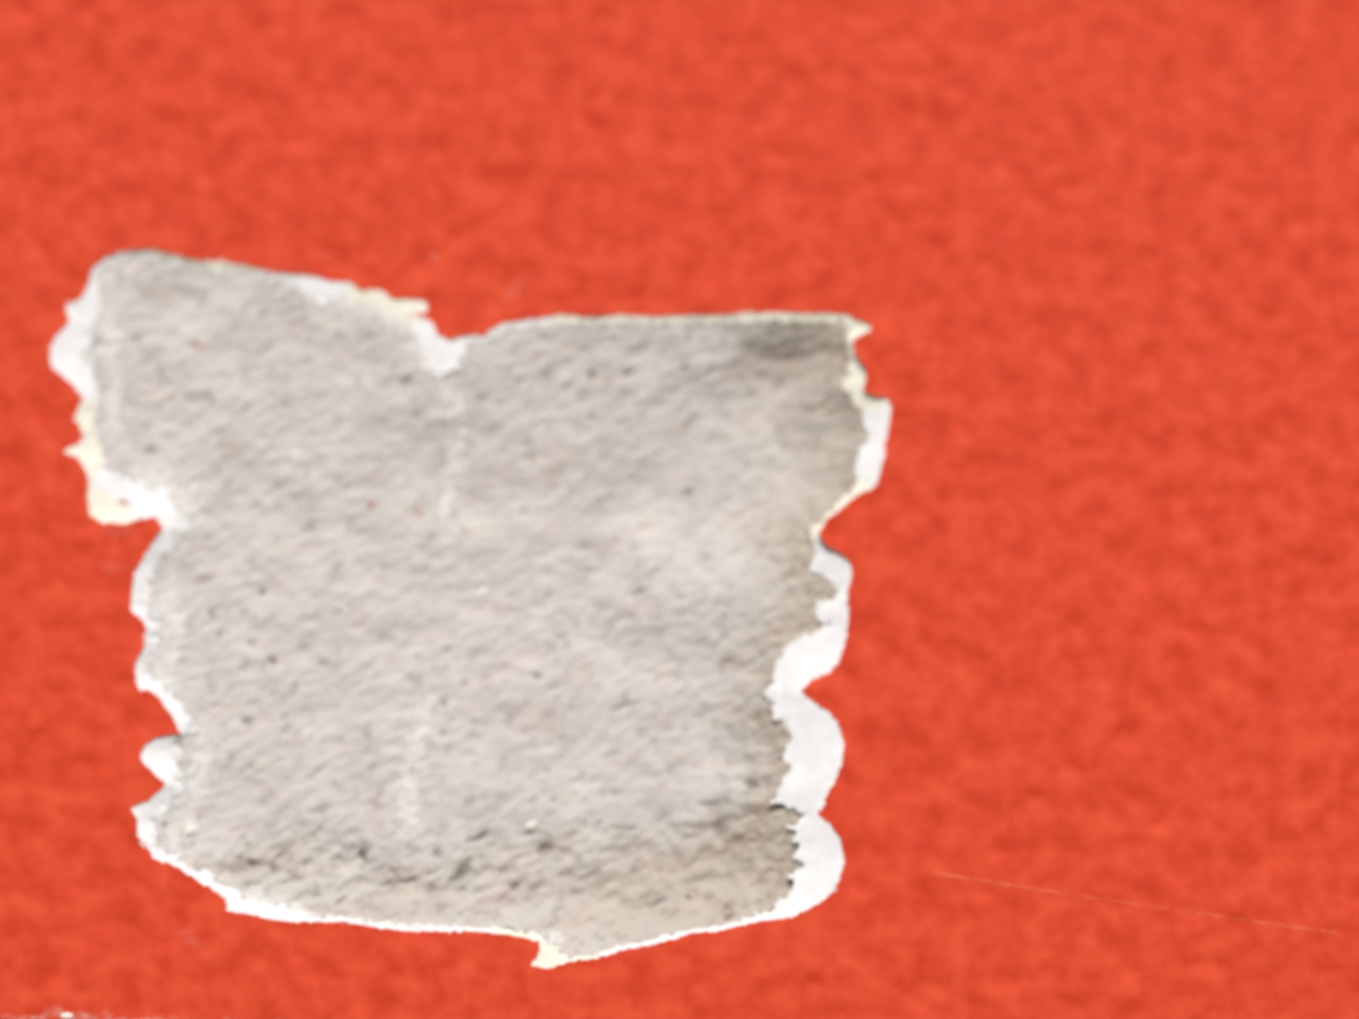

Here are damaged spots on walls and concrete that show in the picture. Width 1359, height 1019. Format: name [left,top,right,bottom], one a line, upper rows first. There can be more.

peeling [50,249,892,969]